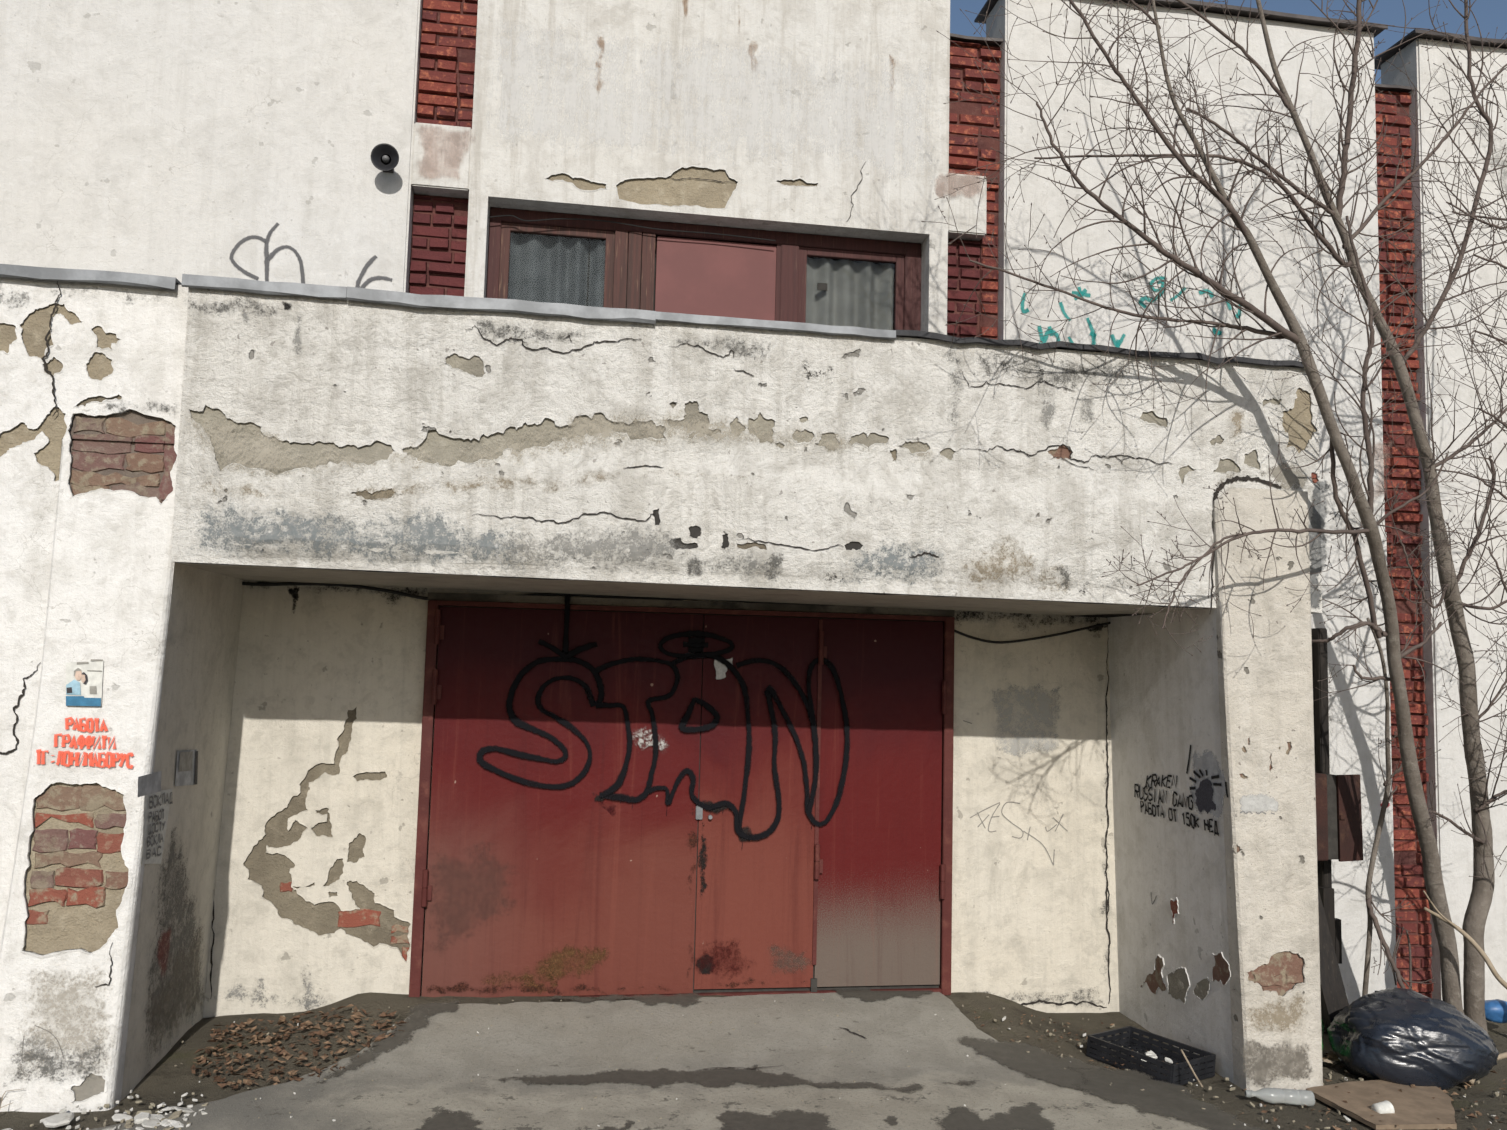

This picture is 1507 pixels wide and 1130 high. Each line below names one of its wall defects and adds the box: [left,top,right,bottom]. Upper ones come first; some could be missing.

spalling [544,165,738,209]
crack [41,281,61,416]
crack [466,325,638,354]
flaking render [0,303,956,505]
water stain [447,478,531,492]
water stain [198,508,783,579]
water stain [823,543,941,586]
water stain [964,540,1088,594]
crack [0,662,41,755]
flaking render [21,781,132,959]
spalling [242,707,411,962]
crack [1020,637,1111,1008]